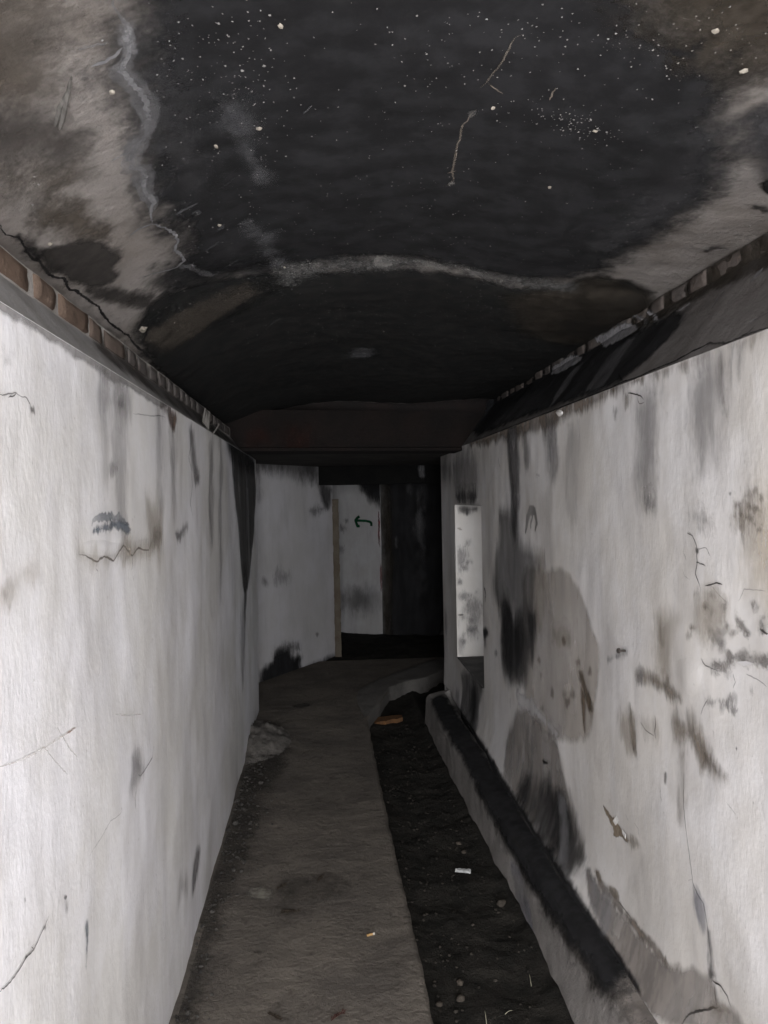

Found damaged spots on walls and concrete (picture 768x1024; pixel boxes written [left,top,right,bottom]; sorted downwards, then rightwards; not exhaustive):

damp [0,0,288,350]
damp [742,104,768,179]
crack [0,225,159,367]
damp [228,443,255,472]
crack [83,536,154,571]
crack [688,531,722,590]
damp [505,710,740,1024]